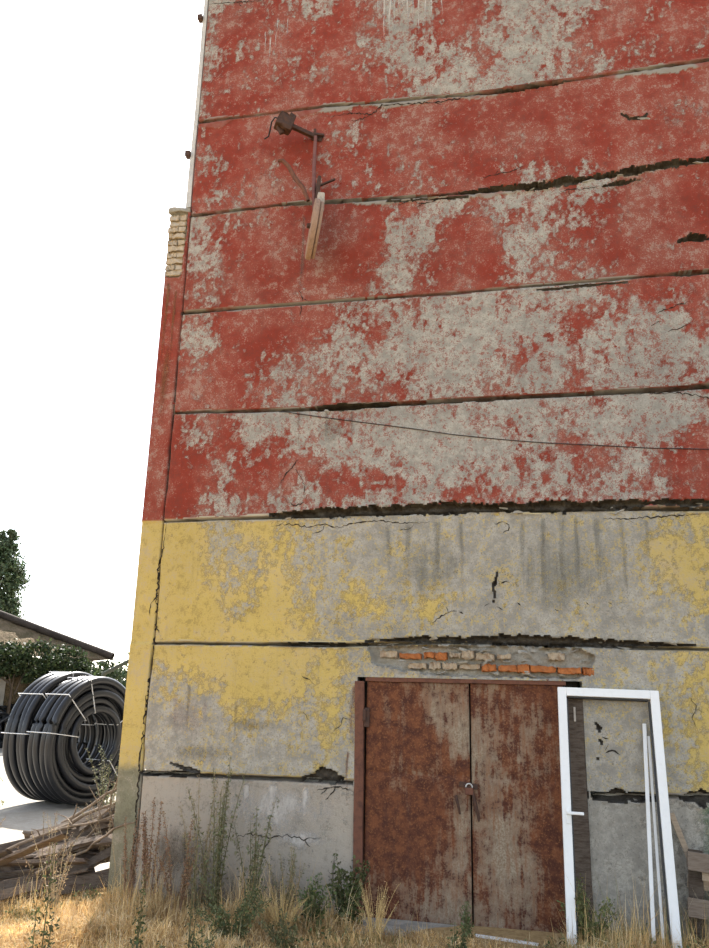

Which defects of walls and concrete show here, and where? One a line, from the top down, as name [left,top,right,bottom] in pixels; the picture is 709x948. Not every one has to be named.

crack [328,94,478,121]
peeling [144,0,709,942]
crack [604,513,700,521]
crack [236,833,321,847]